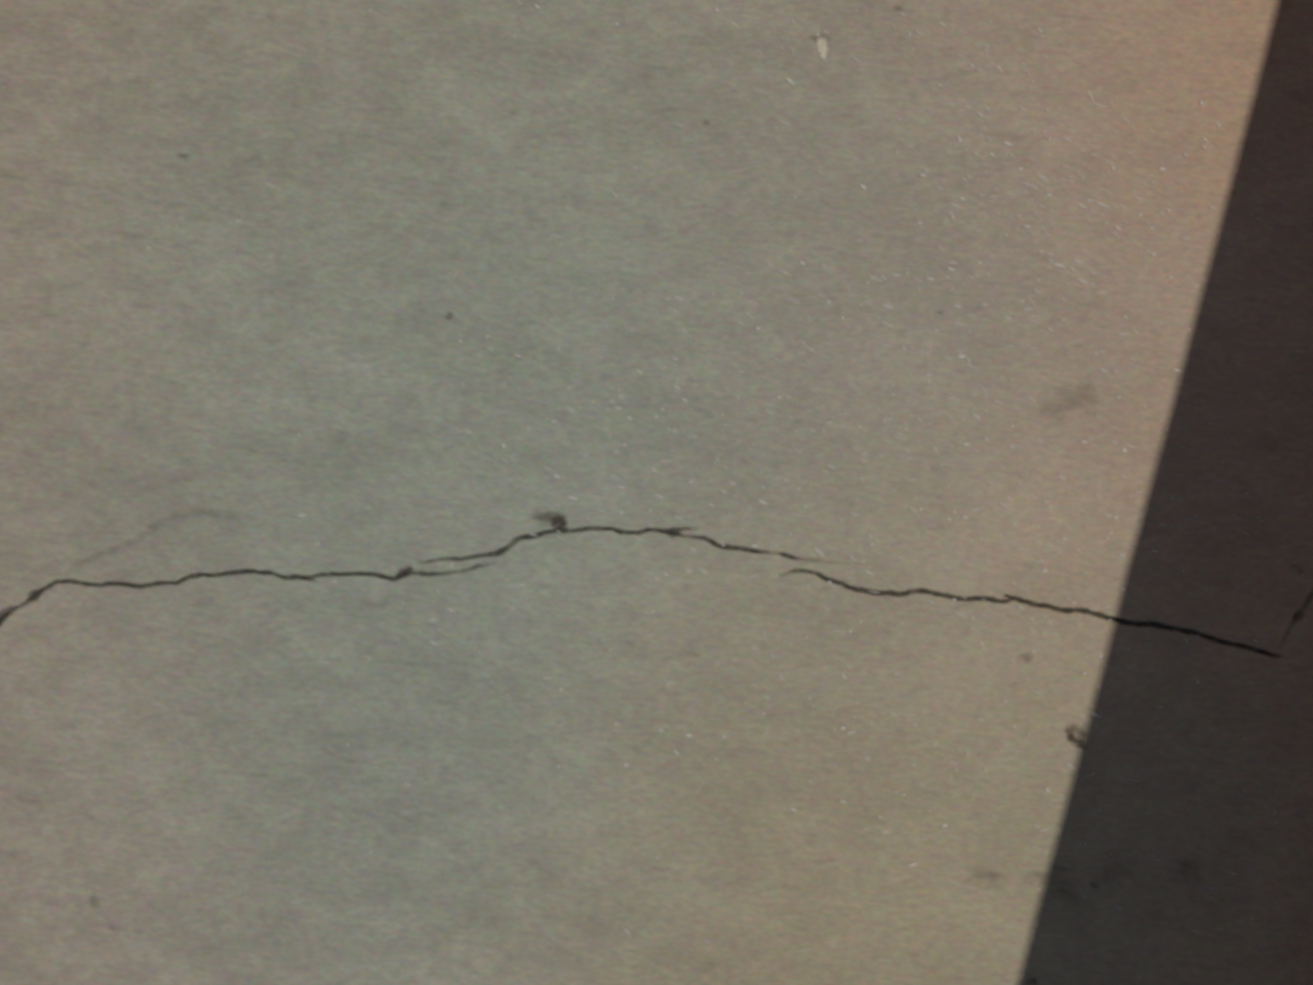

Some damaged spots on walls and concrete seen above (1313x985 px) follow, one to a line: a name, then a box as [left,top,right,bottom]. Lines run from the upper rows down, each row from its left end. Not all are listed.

crack [0,515,1272,656]